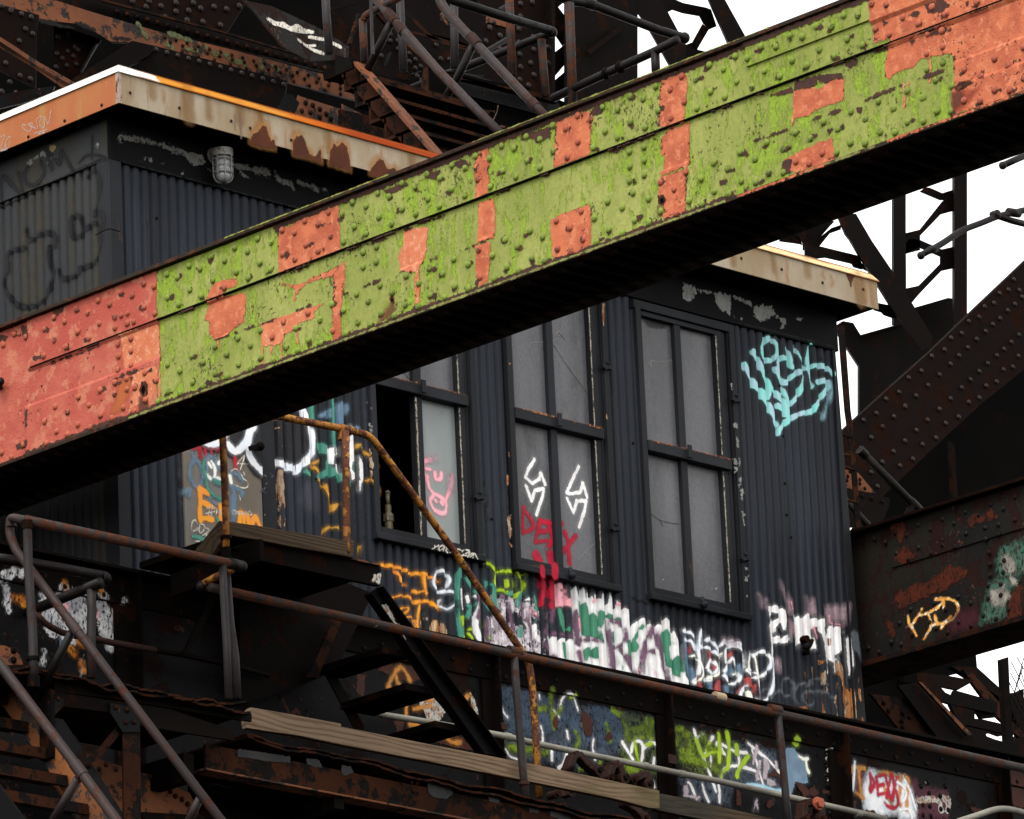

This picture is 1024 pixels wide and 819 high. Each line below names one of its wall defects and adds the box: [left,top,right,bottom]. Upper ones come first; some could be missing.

peeling [909,0,952,44]
rust [240,118,275,149]
rust [293,133,351,171]
rust [369,157,398,177]
peeling [233,0,869,233]
peeling [856,84,902,113]
peeling [16,108,844,455]
peeling [732,422,746,526]
peeling [262,466,286,528]
rust [890,521,916,565]
rust [893,564,968,610]
rust [378,664,420,681]